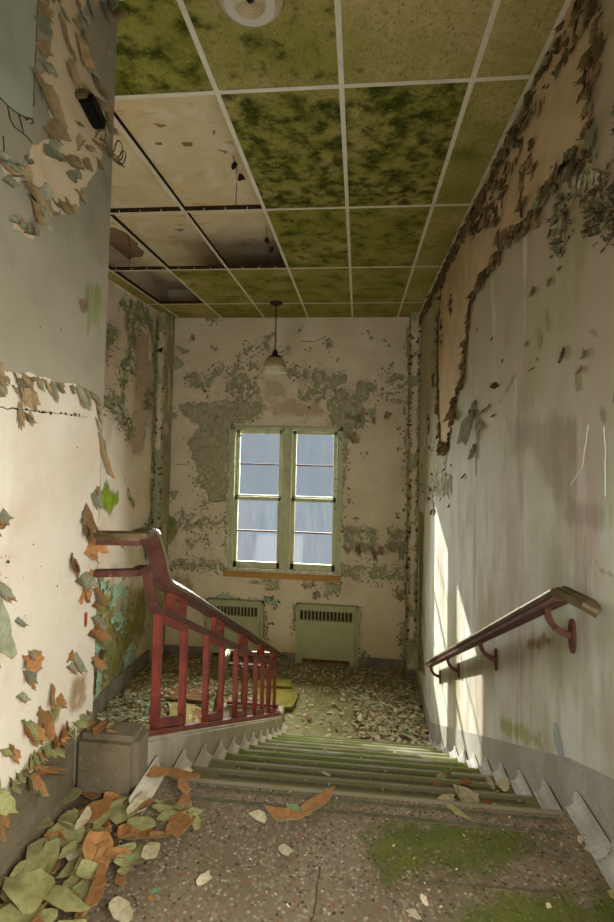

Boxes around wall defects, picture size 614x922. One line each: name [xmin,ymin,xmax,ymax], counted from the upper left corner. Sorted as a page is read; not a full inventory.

crack [0,0,39,152]
peeling [0,0,127,239]
spalling [109,228,144,259]
peeling [168,0,614,660]
peeling [0,294,184,842]
peeling [160,647,430,745]